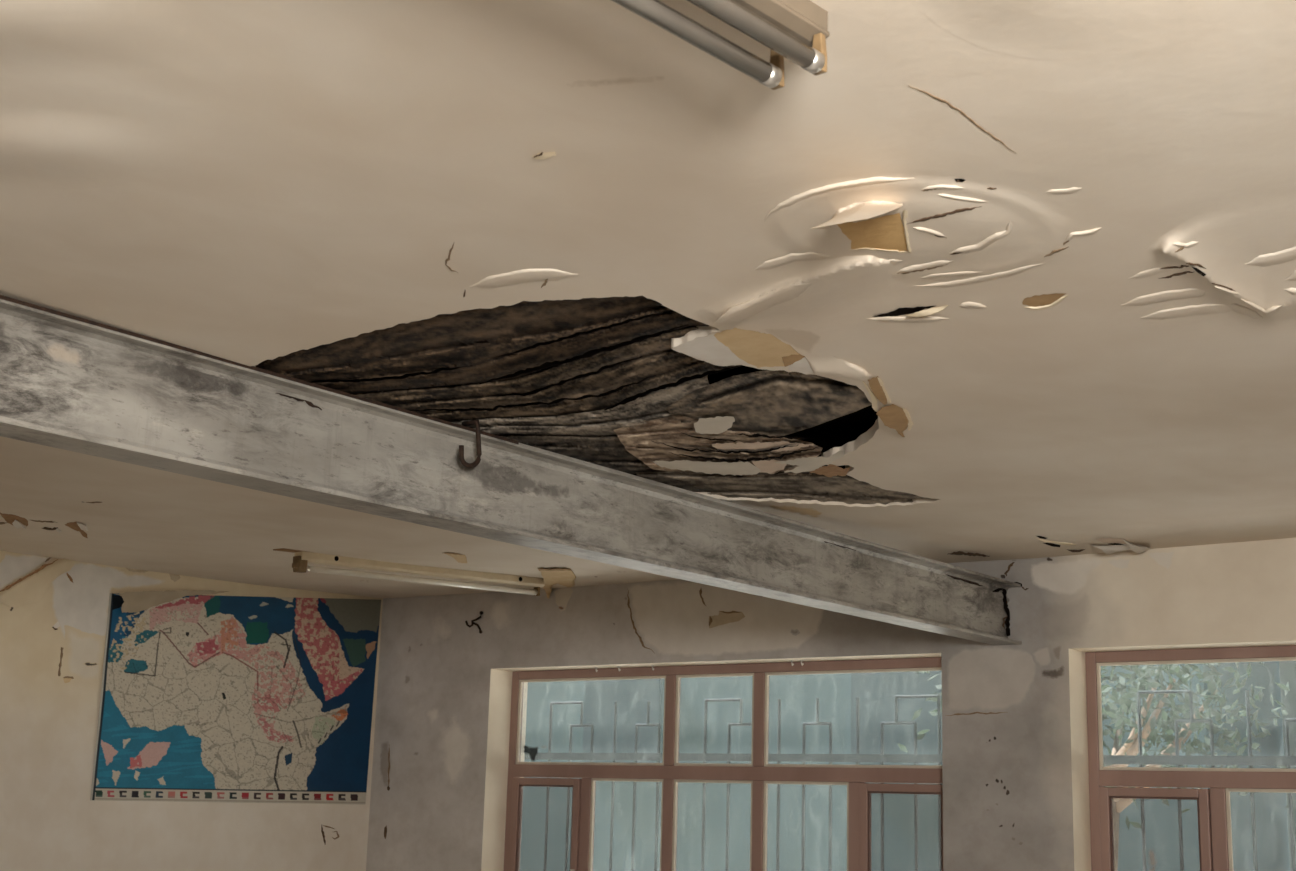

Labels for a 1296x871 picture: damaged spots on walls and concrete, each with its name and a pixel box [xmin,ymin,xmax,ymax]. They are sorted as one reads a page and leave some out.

crack [908,85,1014,152]
crack [897,179,997,274]
crack [1044,240,1069,257]
peeling [1022,293,1068,310]
water stain [0,318,91,372]
water stain [109,356,268,412]
peeling [672,328,914,437]
flaking render [653,416,845,475]
water stain [424,446,592,506]
water stain [751,504,826,520]
flaking render [0,553,169,683]
crack [947,551,1053,636]